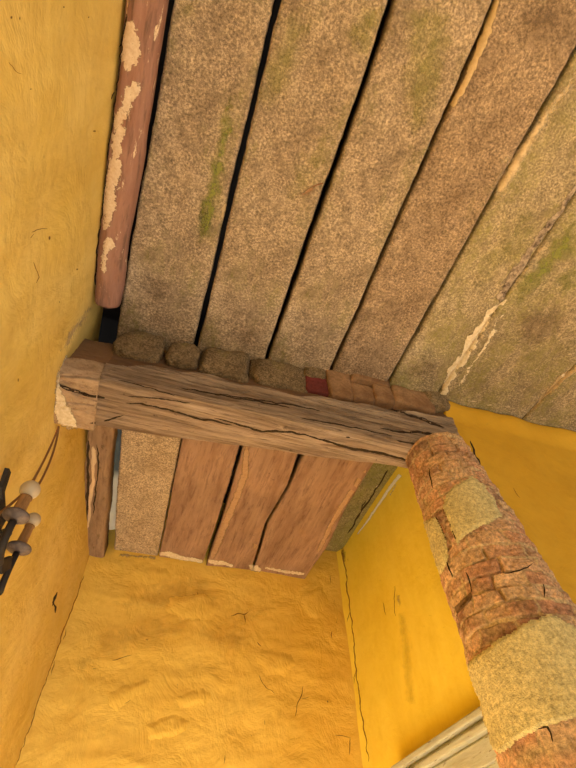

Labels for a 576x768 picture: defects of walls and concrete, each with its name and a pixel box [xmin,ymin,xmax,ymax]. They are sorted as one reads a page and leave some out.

peeling [121,21,141,72]
peeling [100,81,141,273]
crack [60,384,105,399]
crack [91,380,444,461]
crack [330,551,369,761]